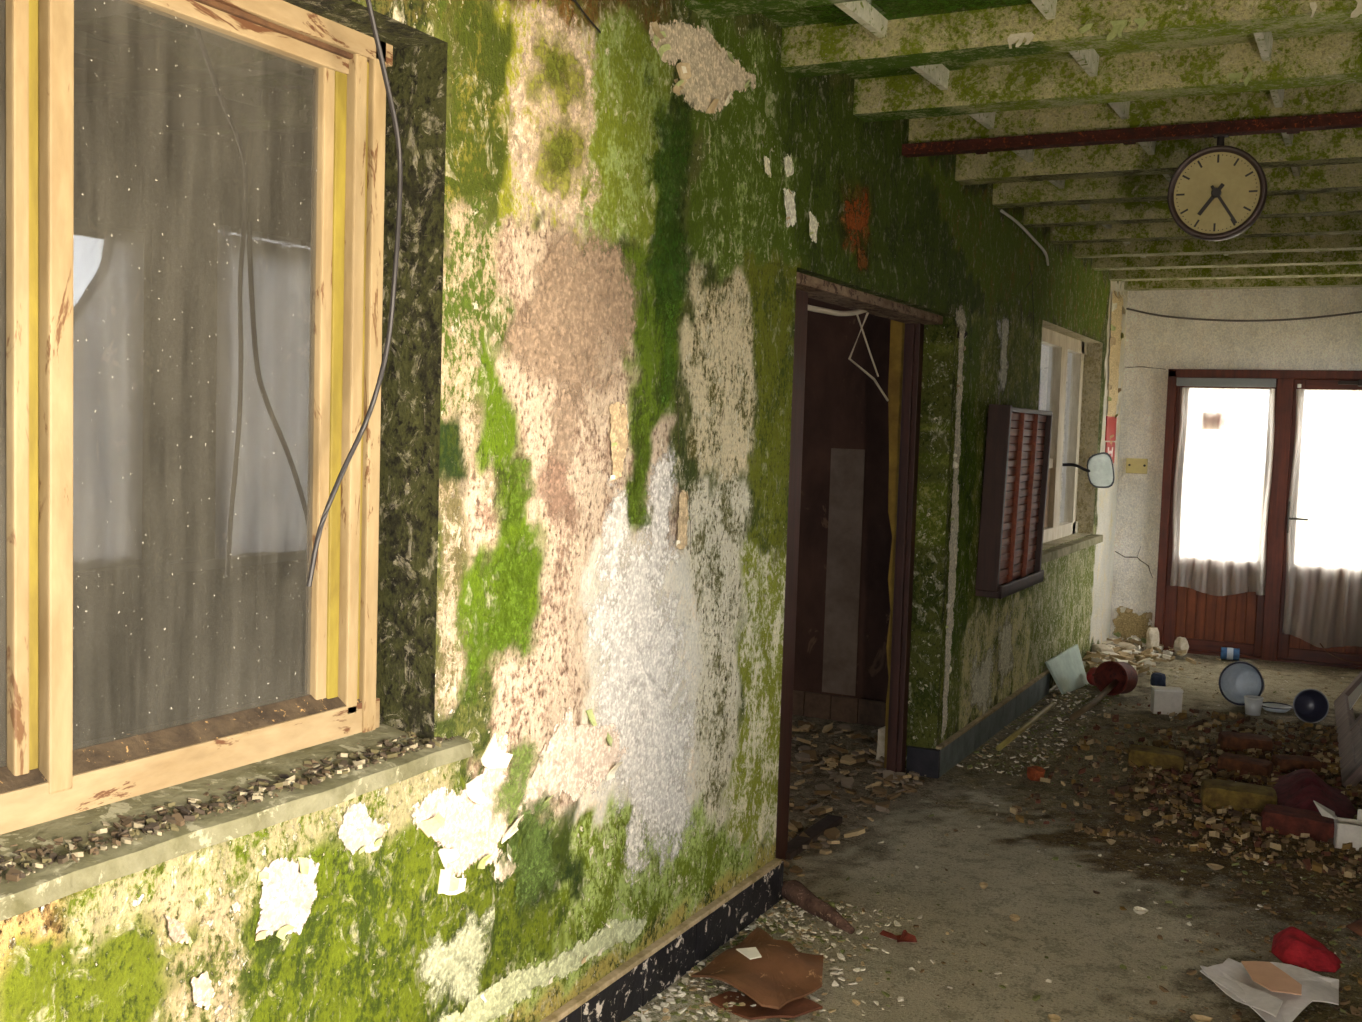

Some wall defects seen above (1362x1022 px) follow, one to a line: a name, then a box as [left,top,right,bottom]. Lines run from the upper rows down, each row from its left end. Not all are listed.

flaking render [649,19,756,115]
water stain [505,9,636,529]
water stain [646,94,693,405]
peeling [764,153,820,242]
rust [841,186,871,271]
water stain [587,416,695,872]
peeling [338,802,390,855]
water stain [493,742,542,824]
peeling [412,706,629,895]
flaking render [255,857,320,941]
water stain [421,908,495,1003]